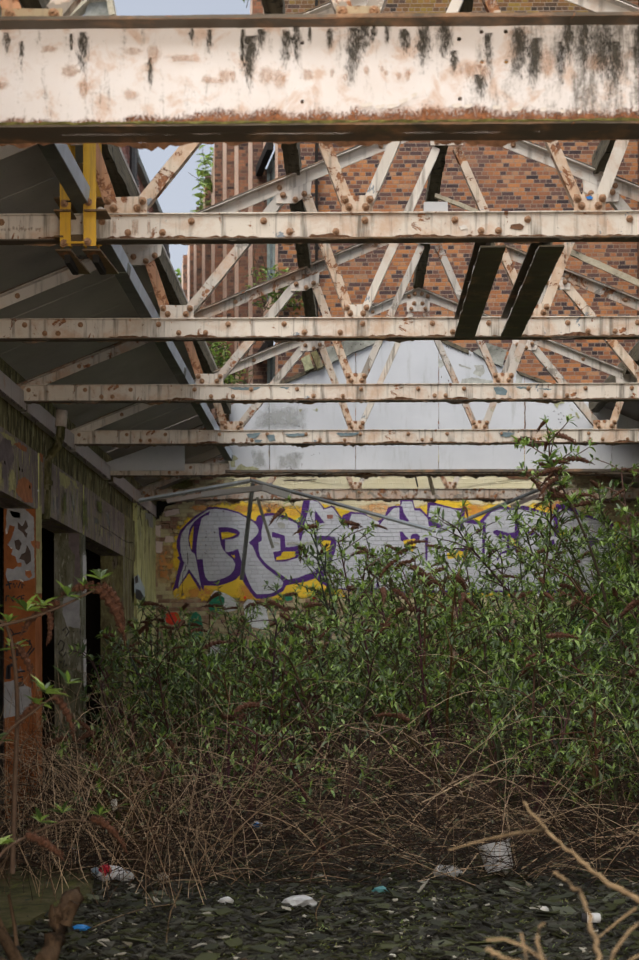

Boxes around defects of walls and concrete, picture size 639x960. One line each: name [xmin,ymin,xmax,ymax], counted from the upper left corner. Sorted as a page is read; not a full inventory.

leakage [69,32,89,71]
leakage [240,29,266,85]
leakage [282,27,312,66]
corrosion [69,104,639,123]
leakage [346,26,459,82]
leakage [473,74,491,97]
leakage [485,33,493,65]
leakage [511,26,544,83]
leakage [557,24,639,95]
peeling [0,463,42,593]